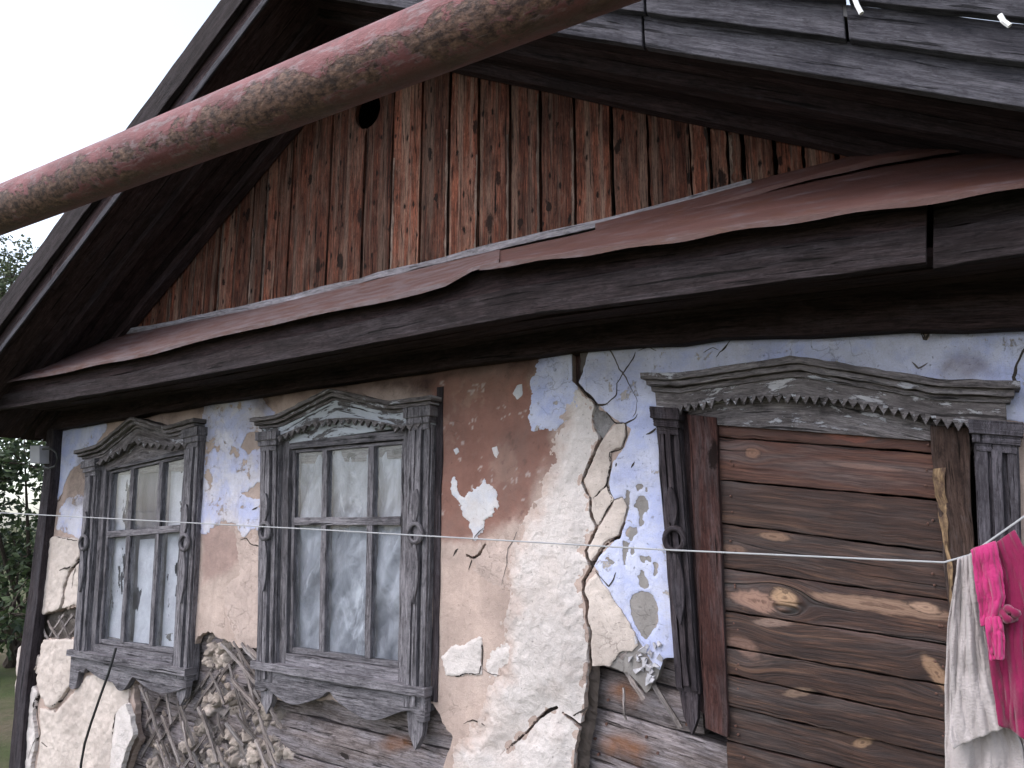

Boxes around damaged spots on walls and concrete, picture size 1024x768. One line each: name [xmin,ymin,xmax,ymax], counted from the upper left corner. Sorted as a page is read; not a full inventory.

peeling [56,423,107,539]
peeling [200,398,275,649]
peeling [450,477,512,590]
crack [576,348,656,601]
peeling [513,332,1024,670]
crack [511,638,600,768]